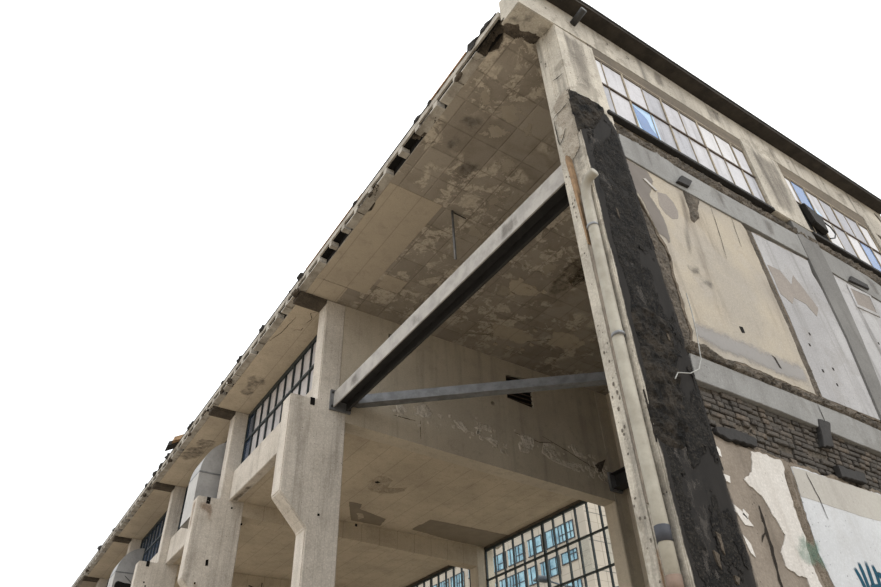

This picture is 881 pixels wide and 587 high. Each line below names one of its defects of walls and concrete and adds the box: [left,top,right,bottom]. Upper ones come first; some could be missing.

spalling [472,20,540,61]
spalling [553,87,580,161]
peeling [712,531,726,570]
peeling [734,505,756,558]
crack [758,505,783,587]
peeling [743,451,822,587]